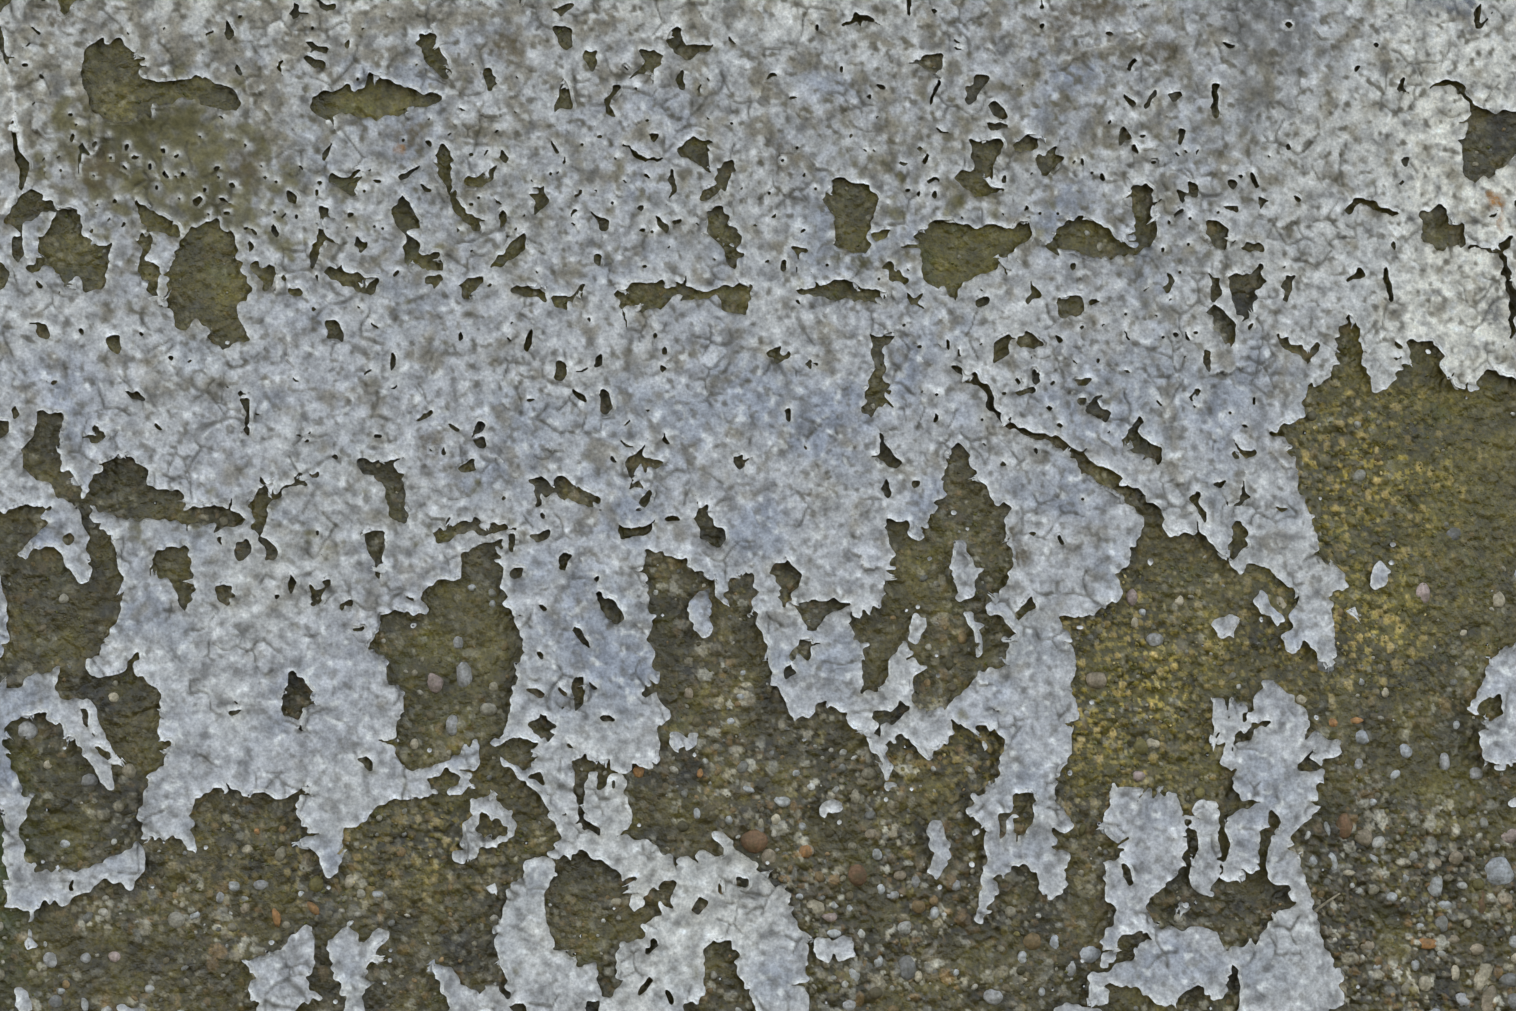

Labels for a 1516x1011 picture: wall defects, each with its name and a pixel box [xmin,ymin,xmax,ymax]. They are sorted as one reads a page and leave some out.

peeling [0,0,759,356]
peeling [775,47,1301,408]
peeling [1453,102,1516,191]
peeling [0,309,1516,1011]